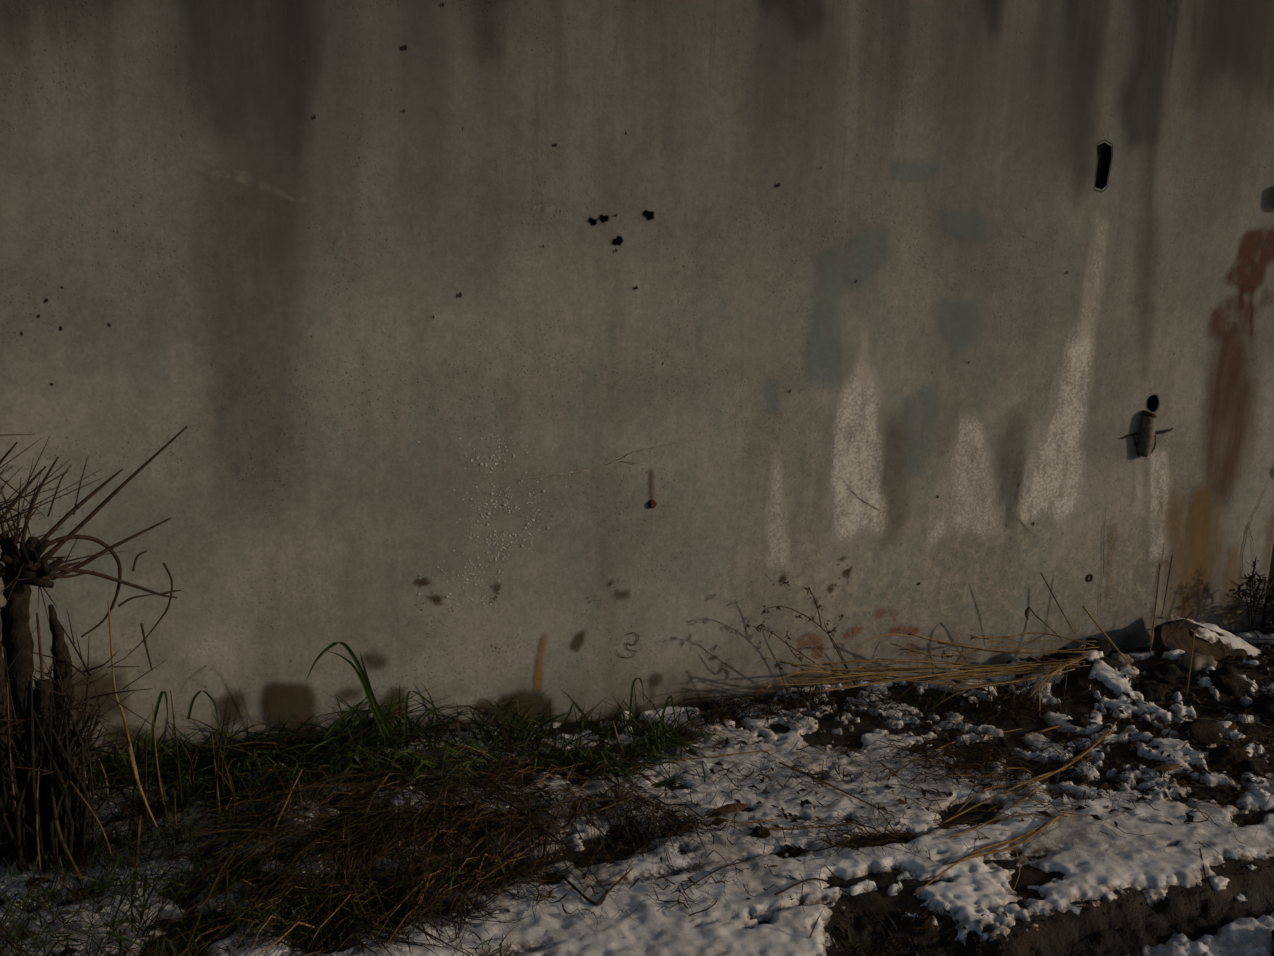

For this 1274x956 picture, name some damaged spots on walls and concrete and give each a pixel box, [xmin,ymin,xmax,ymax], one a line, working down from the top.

spalling [588,214,617,226]
water stain [830,337,903,541]
water stain [927,226,1104,543]